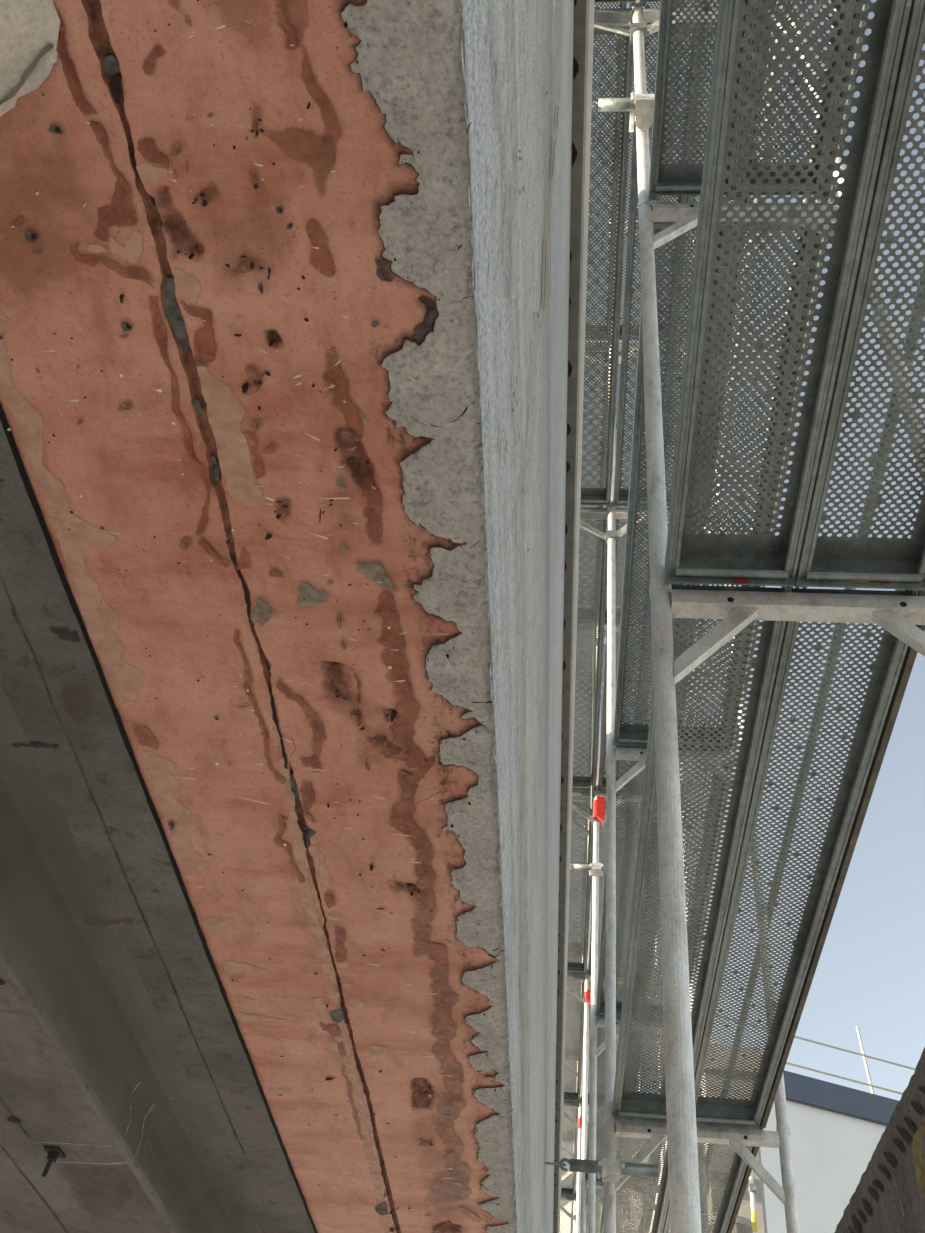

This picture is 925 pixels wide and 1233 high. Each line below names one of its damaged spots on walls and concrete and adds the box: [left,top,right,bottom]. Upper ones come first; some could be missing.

corrosion [266,0,342,195]
peeling [0,314,145,704]
peeling [197,365,289,519]
corrosion [323,355,383,546]
crack [387,406,481,503]
crack [81,0,401,1233]
peeling [338,0,518,1233]
crack [417,675,493,822]
peeling [277,757,394,1233]
corrosion [319,1024,363,1140]
corrosion [375,591,481,1222]
crack [448,856,505,968]